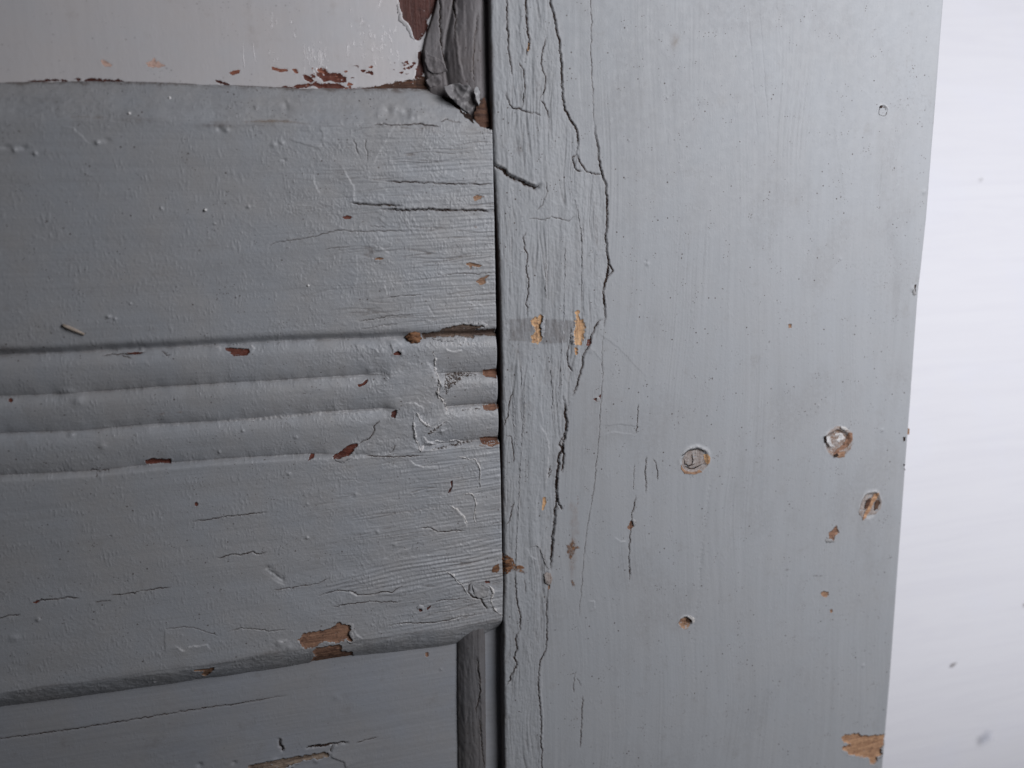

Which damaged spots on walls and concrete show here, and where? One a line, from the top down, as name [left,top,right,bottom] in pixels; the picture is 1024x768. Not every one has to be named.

peeling [272,0,491,128]
crack [271,164,573,309]
peeling [226,343,250,356]
peeling [531,314,546,344]
peeling [569,310,592,355]
crack [506,0,614,768]
peeling [332,443,358,463]
peeling [479,436,499,447]
peeling [826,426,848,447]
crack [283,579,487,624]
peeling [298,622,356,661]
peeling [841,733,885,765]